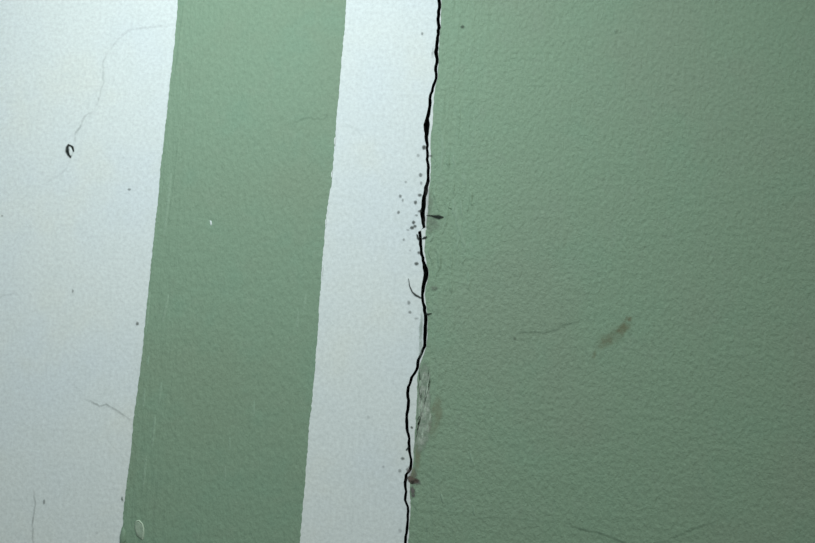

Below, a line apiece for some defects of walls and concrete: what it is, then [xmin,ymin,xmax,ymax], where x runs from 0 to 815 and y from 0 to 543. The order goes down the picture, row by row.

crack [404,0,443,543]